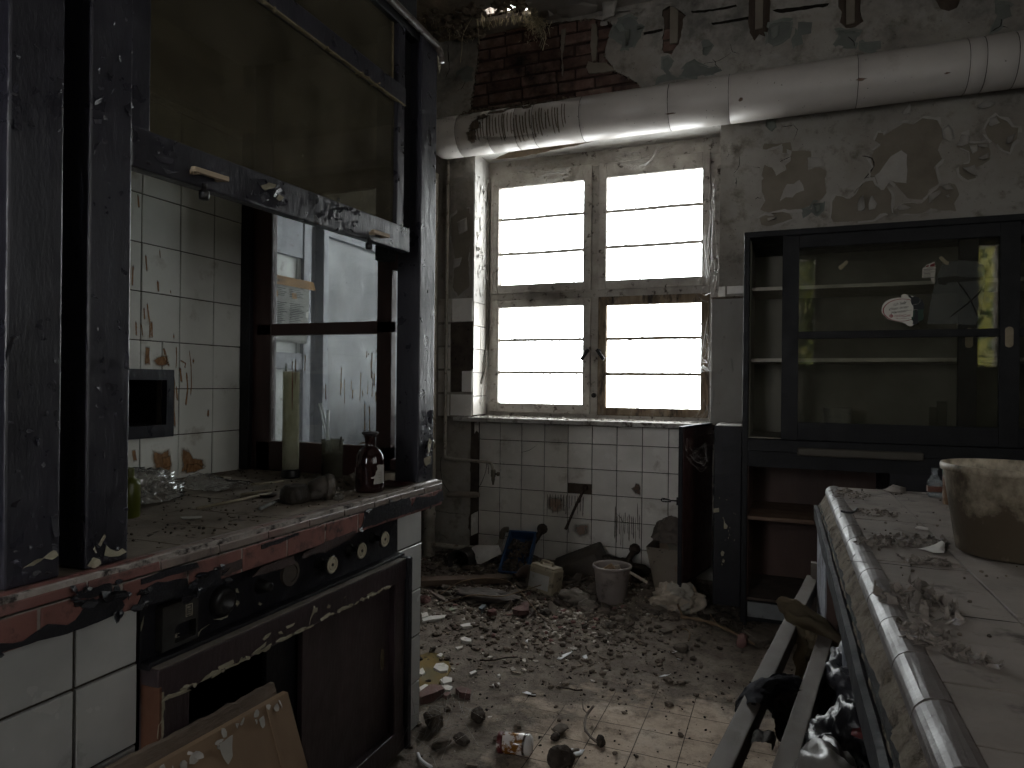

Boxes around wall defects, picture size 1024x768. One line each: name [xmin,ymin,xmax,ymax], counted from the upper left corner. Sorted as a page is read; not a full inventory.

spalling [417,0,645,113]
spalling [655,6,722,85]
spalling [748,0,812,49]
spalling [833,0,881,53]
spalling [936,0,960,11]
peeling [756,142,827,228]
peeling [866,104,959,216]
rust [135,304,194,427]
leakage [607,484,640,557]
peeling [852,532,951,548]